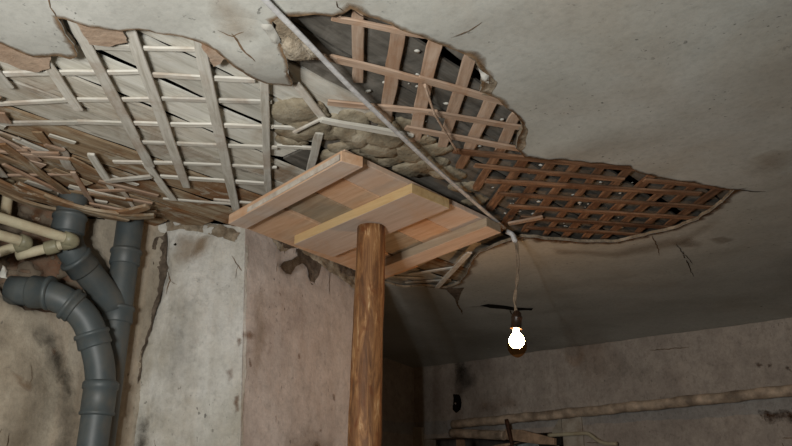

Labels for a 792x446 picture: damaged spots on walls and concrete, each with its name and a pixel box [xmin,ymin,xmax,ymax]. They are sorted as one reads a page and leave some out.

spalling [0,5,591,164]
spalling [11,198,53,228]
spalling [0,224,83,313]
spalling [272,238,356,290]
spalling [425,162,742,315]
crack [652,236,694,277]